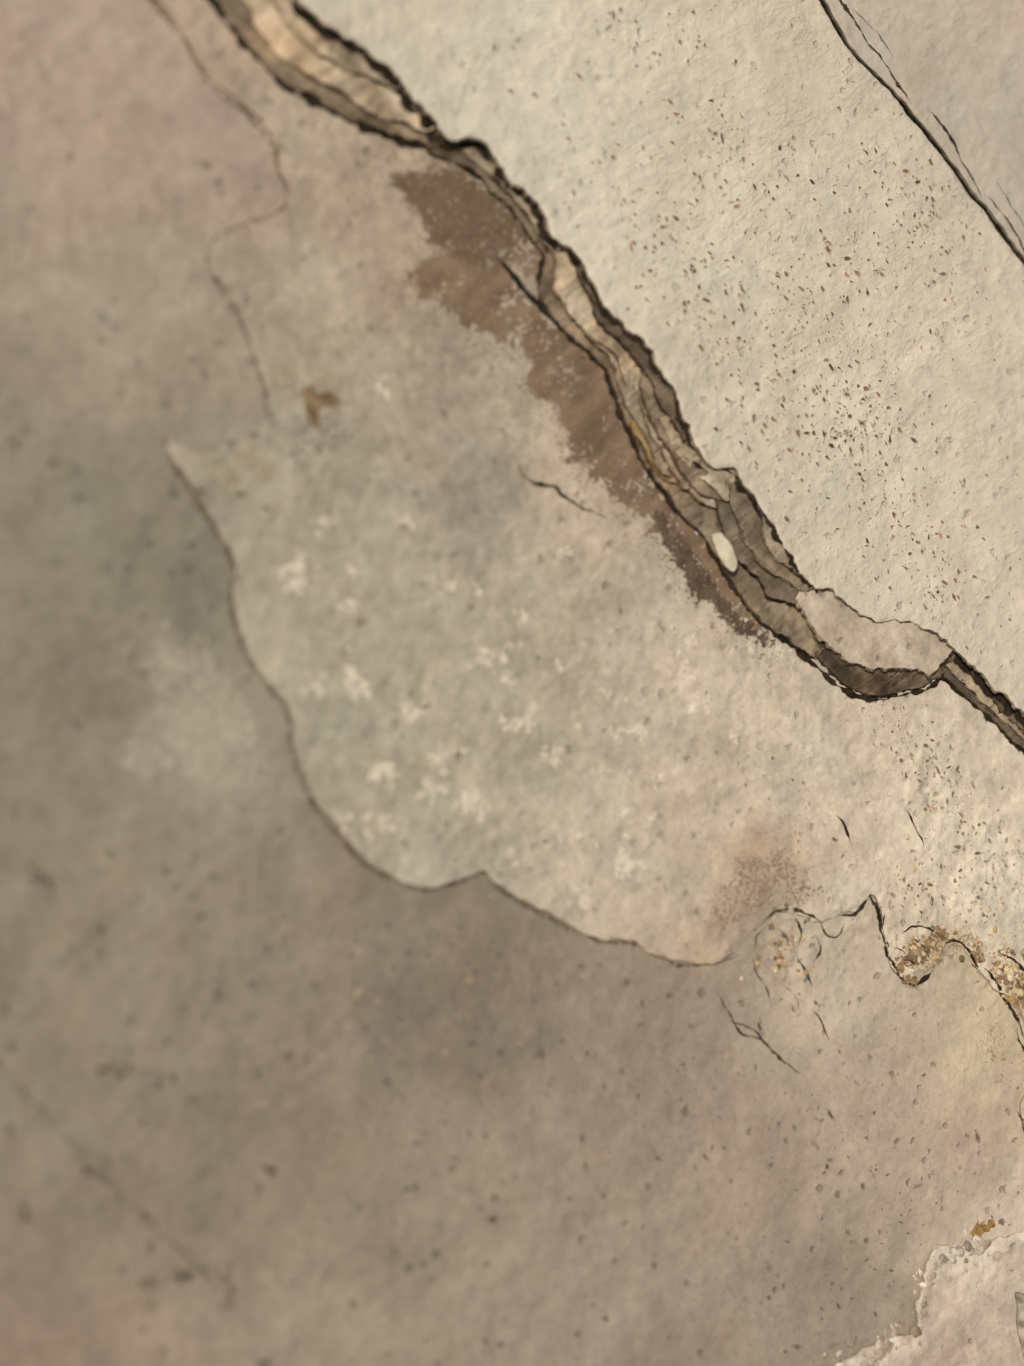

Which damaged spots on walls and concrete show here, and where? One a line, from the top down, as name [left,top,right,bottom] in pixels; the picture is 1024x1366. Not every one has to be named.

crack [149,0,288,411]
damp [278,508,338,595]
damp [358,142,794,718]
peeling [156,0,1024,1024]
crack [207,0,1024,752]
damp [300,647,372,704]
damp [368,744,506,826]
damp [458,607,564,781]
crack [163,437,1024,1072]
damp [541,806,659,882]
peeling [834,1229,1024,1366]